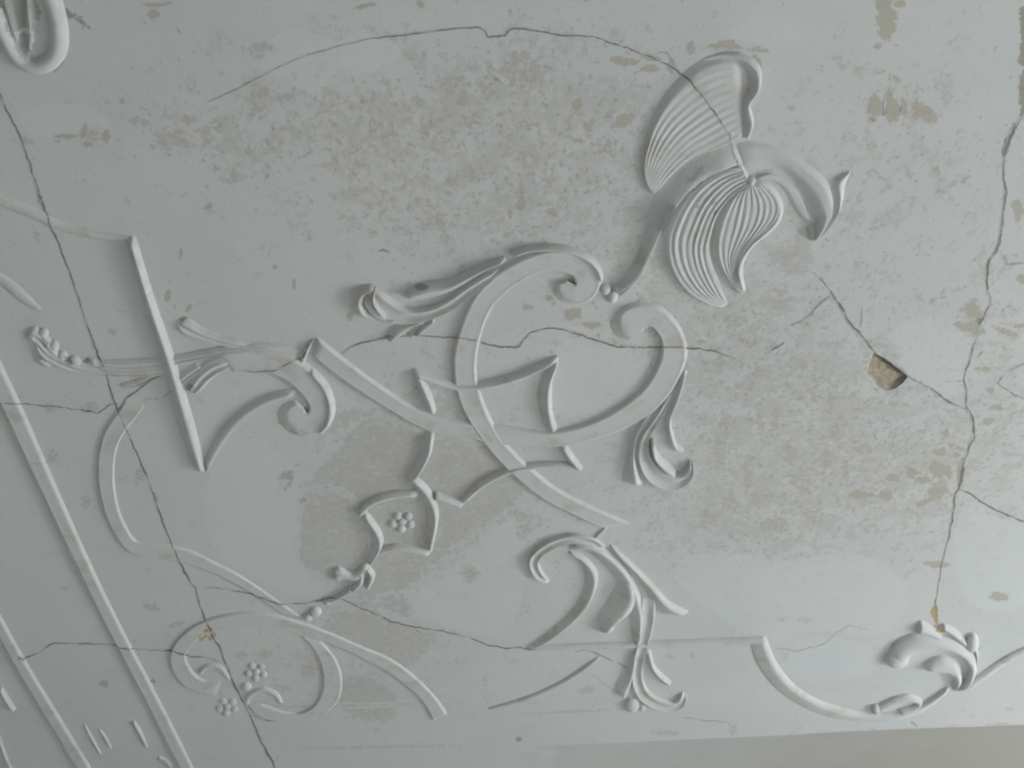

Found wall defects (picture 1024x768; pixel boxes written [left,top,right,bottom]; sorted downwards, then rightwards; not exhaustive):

flaking render [870,0,909,52]
crack [206,26,747,182]
flaking render [862,74,945,129]
crack [342,327,735,359]
crack [771,272,875,352]
flaking render [867,353,908,390]
crack [907,114,1024,621]
crack [0,93,530,768]